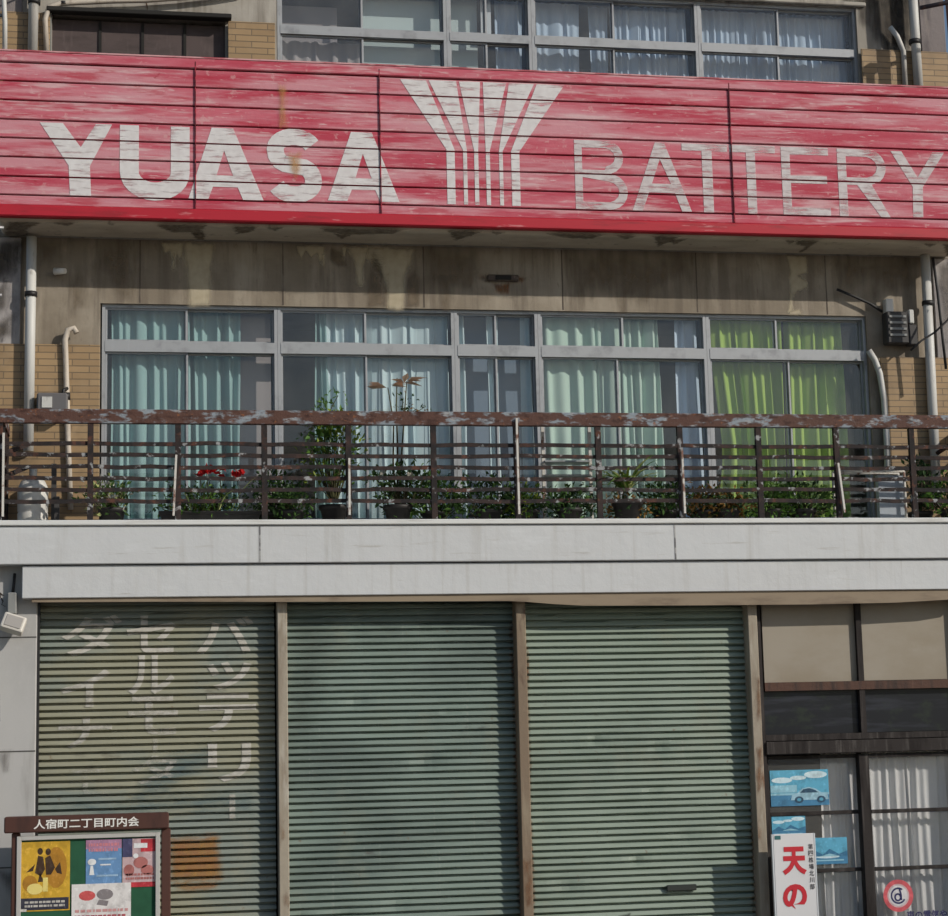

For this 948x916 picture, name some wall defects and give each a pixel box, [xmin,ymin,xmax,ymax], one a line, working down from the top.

water stain [297,246,419,309]